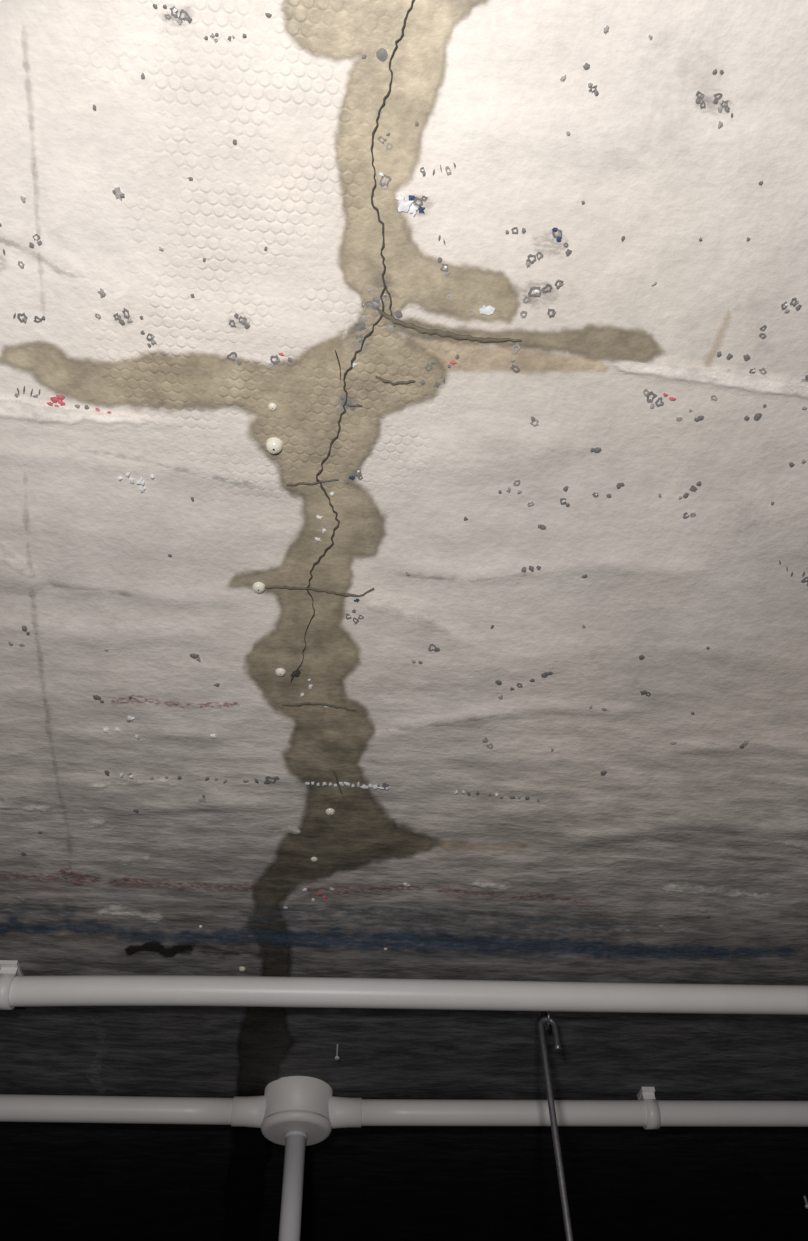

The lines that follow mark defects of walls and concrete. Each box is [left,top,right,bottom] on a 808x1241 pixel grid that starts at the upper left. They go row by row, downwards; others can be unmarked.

crack [264,0,522,711]
water stain [0,0,662,977]
crack [333,770,342,794]
water stain [237,1007,293,1097]
water stain [224,1127,271,1241]